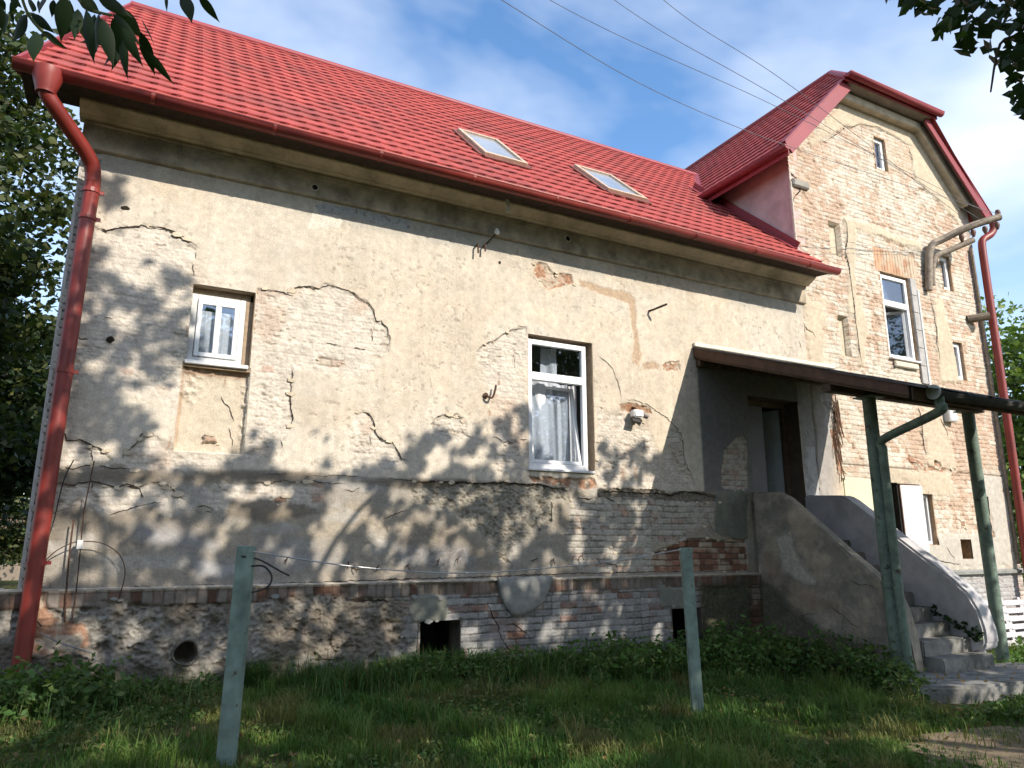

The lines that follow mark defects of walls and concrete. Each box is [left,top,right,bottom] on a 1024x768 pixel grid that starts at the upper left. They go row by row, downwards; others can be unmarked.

peeling [815,122,913,181]
crack [96,224,196,271]
crack [258,285,391,350]
spalling [53,224,391,517]
crack [53,433,221,515]
crack [246,371,359,492]
spalling [348,410,404,473]
crack [356,358,718,530]
spalling [410,324,749,590]
spalling [959,519,973,559]
spalling [98,597,165,647]
spalling [248,594,417,668]